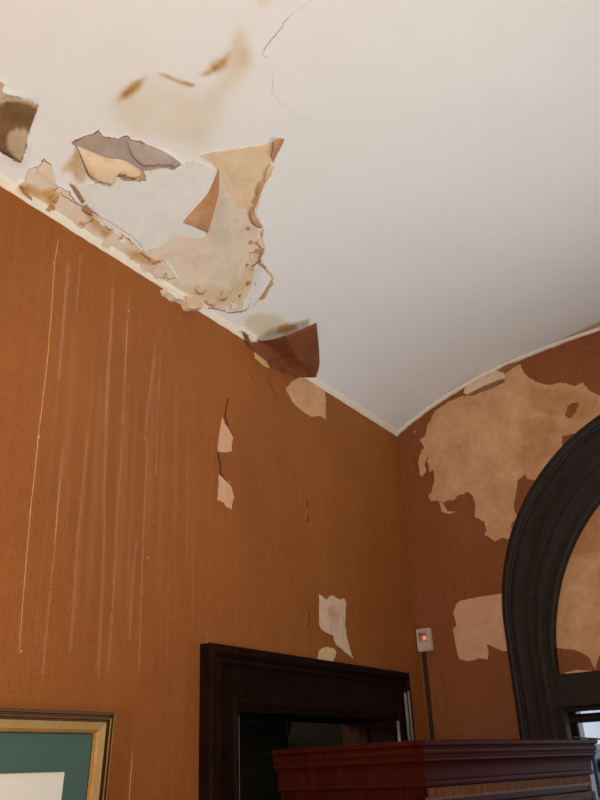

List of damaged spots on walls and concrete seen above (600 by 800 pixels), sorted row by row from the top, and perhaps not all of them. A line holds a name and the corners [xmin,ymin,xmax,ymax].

peeling [0,74,285,313]
peeling [239,326,258,342]
water stain [20,292,53,638]